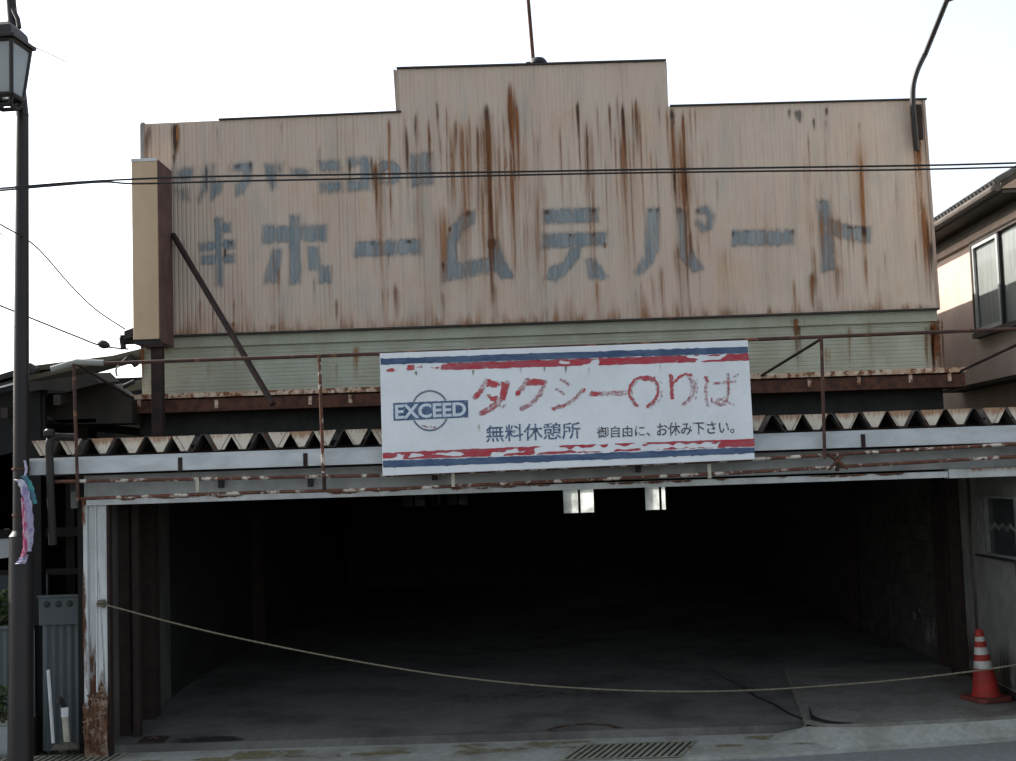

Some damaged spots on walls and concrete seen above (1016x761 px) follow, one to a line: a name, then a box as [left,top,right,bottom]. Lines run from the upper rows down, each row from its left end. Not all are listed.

rust [371,121,391,203]
rust [440,217,451,269]
rust [446,88,519,250]
rust [576,105,588,173]
rust [609,102,642,203]
rust [659,109,699,264]
rust [810,160,866,303]
rust [82,578,108,758]